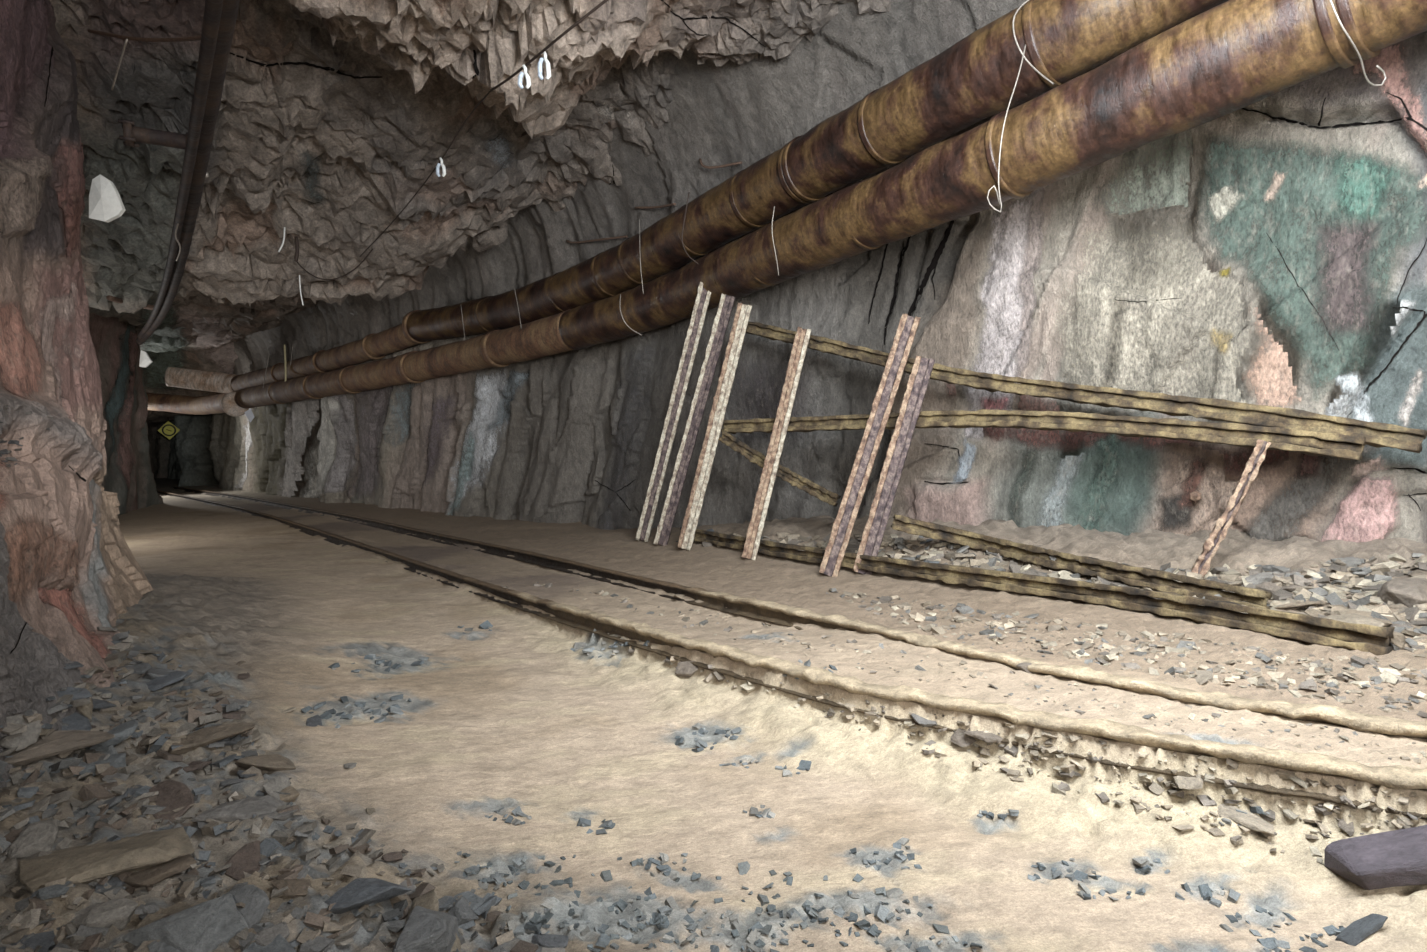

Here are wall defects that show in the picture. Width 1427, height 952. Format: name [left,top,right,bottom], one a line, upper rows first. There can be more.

crack [1242,92,1427,131]
crack [868,220,956,345]
crack [1266,233,1339,350]
crack [1347,239,1427,418]